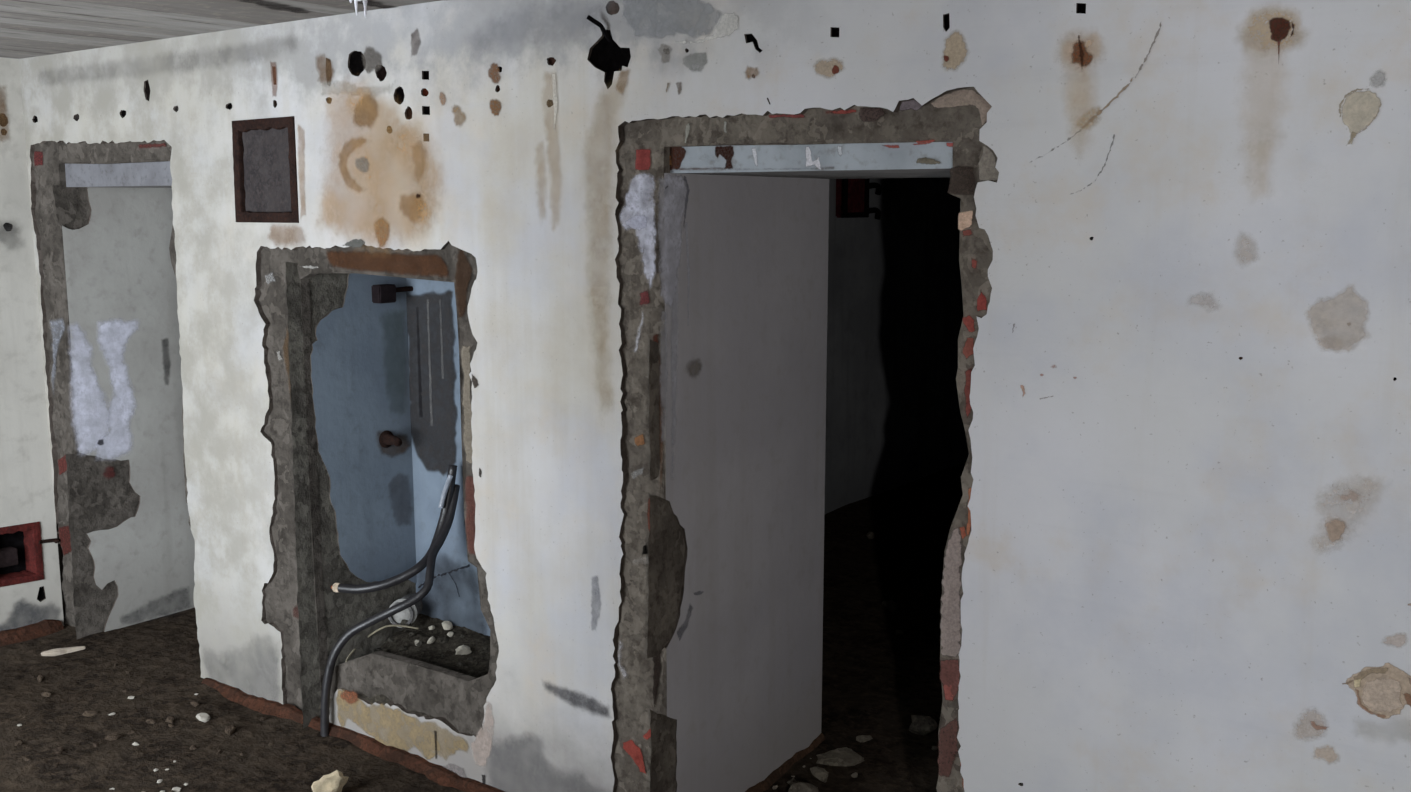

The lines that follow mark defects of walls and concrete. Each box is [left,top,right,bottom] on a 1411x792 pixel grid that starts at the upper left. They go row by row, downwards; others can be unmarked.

water stain [349,0,368,18]
peeling [589,0,763,94]
corrosion [1072,36,1092,66]
crack [1031,23,1161,181]
corrosion [1250,14,1294,62]
spalling [33,141,172,639]
spalling [182,405,191,528]
spalling [259,239,499,778]
spalling [613,87,999,792]
peeling [1342,663,1411,719]